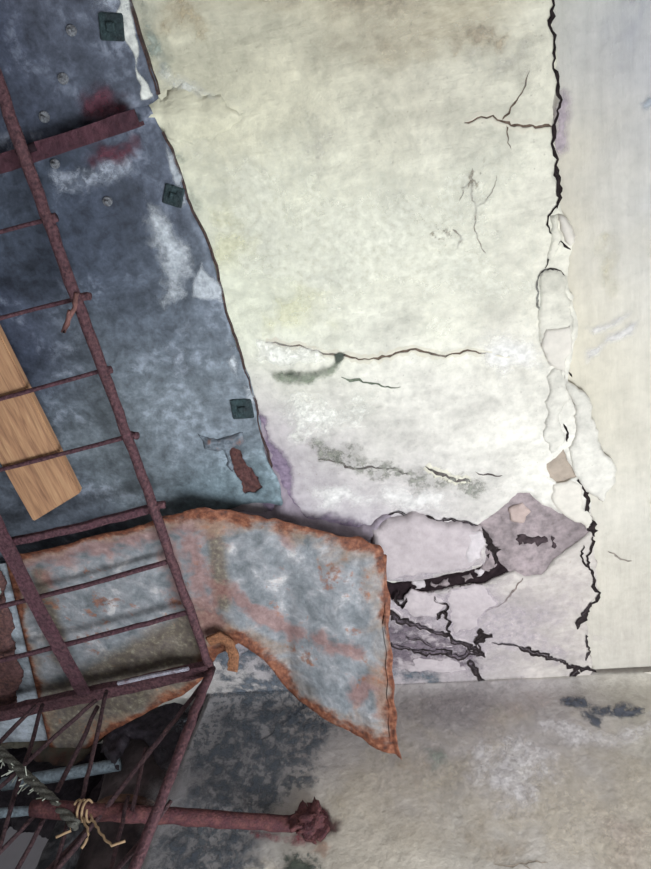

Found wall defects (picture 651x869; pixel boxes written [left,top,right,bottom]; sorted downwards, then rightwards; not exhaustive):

crack [452,168,497,253]
crack [464,0,571,309]
crack [265,336,510,389]
crack [389,479,630,682]